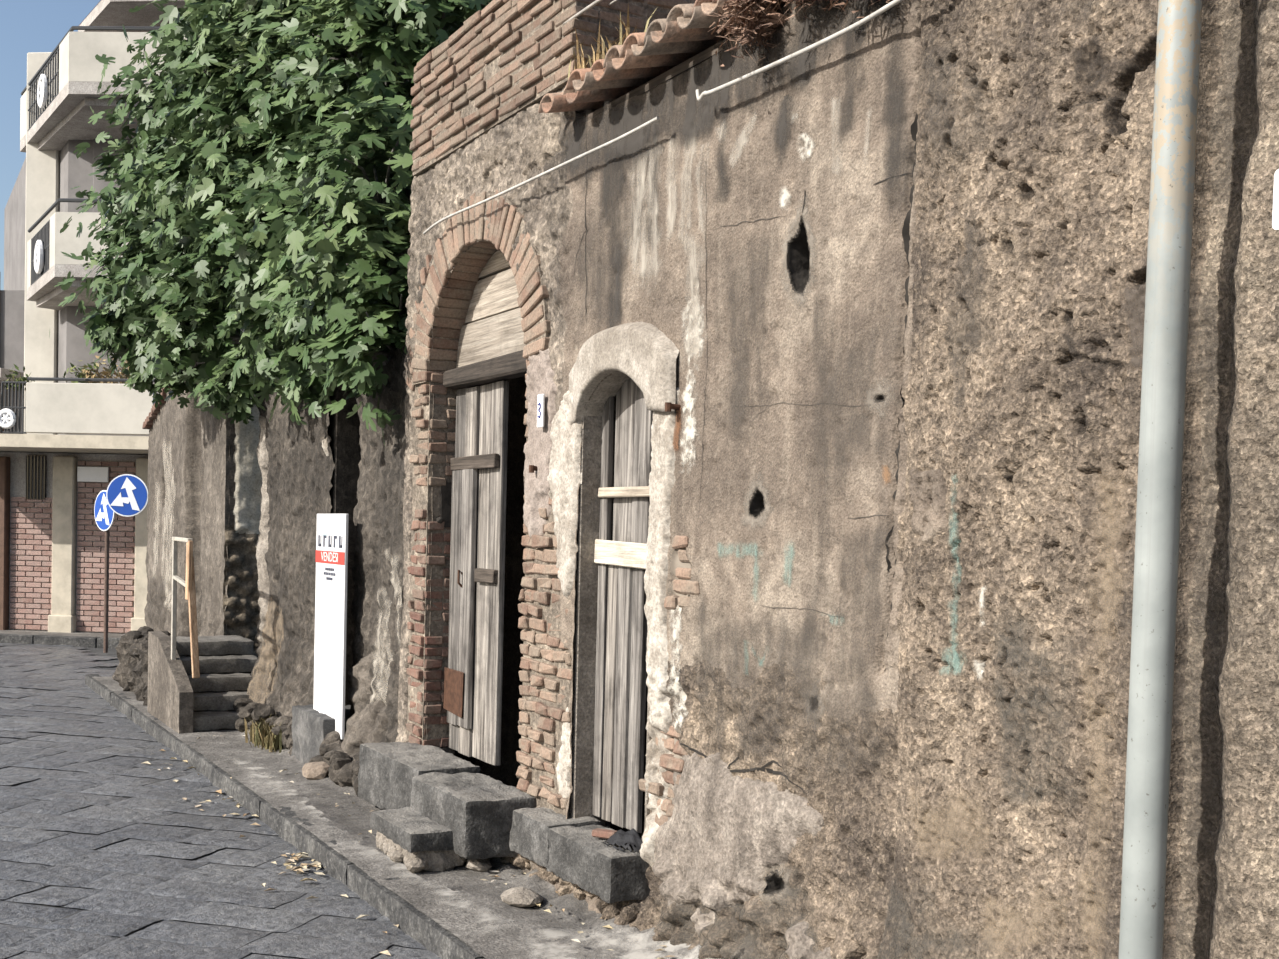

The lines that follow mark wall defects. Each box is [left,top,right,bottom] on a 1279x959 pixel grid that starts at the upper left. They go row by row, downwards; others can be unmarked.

damp [559,0,900,328]
damp [886,57,913,190]
damp [687,242,699,354]
spalling [782,207,815,303]
crack [873,113,918,355]
corrosion [673,409,681,449]
crack [740,402,863,426]
crack [851,388,904,637]
peeling [638,370,700,867]
crack [761,605,844,618]
spalling [756,866,791,904]